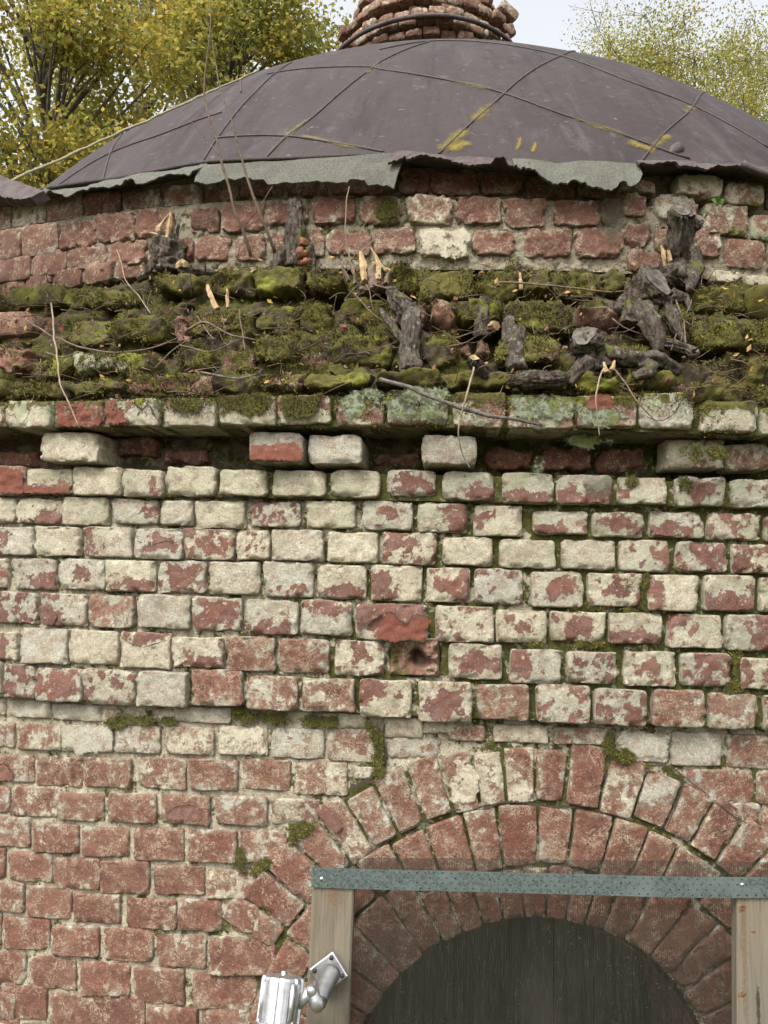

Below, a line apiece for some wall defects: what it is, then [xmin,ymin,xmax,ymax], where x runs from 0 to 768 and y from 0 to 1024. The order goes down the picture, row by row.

spalling [0,450,72,495]
peeling [20,508,63,524]
peeling [107,474,301,635]
spalling [268,439,768,729]
peeling [0,527,136,705]
peeling [120,632,170,649]
peeling [171,642,226,668]